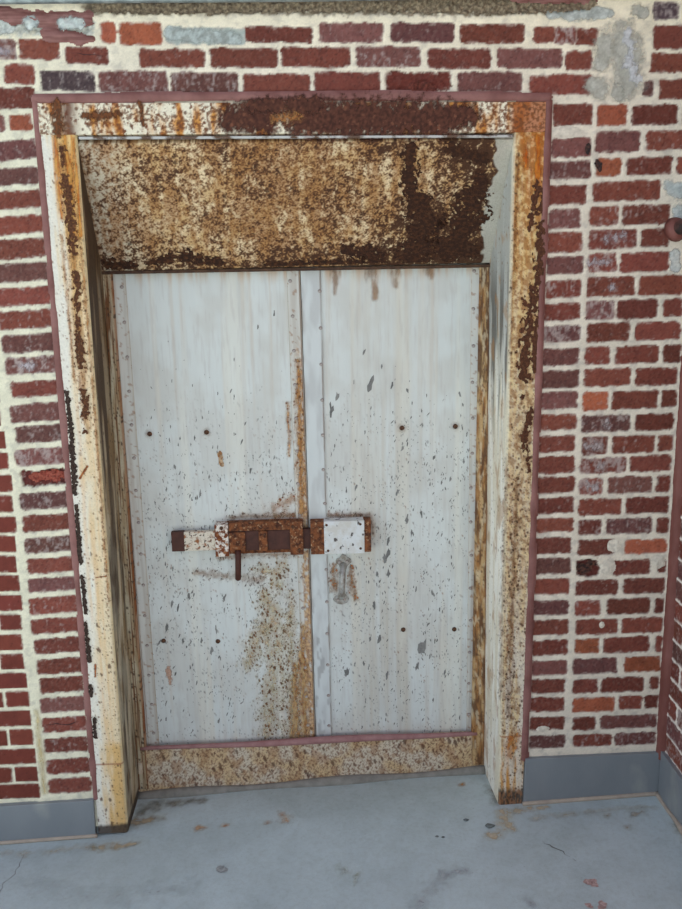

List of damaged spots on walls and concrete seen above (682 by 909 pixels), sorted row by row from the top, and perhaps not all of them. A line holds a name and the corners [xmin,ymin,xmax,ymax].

corrosion [50,97,99,479]
corrosion [80,110,122,121]
corrosion [101,247,226,270]
corrosion [217,92,494,285]
corrosion [513,134,541,240]
efflorescence [622,28,642,84]
corrosion [237,553,312,740]
corrosion [498,456,520,719]